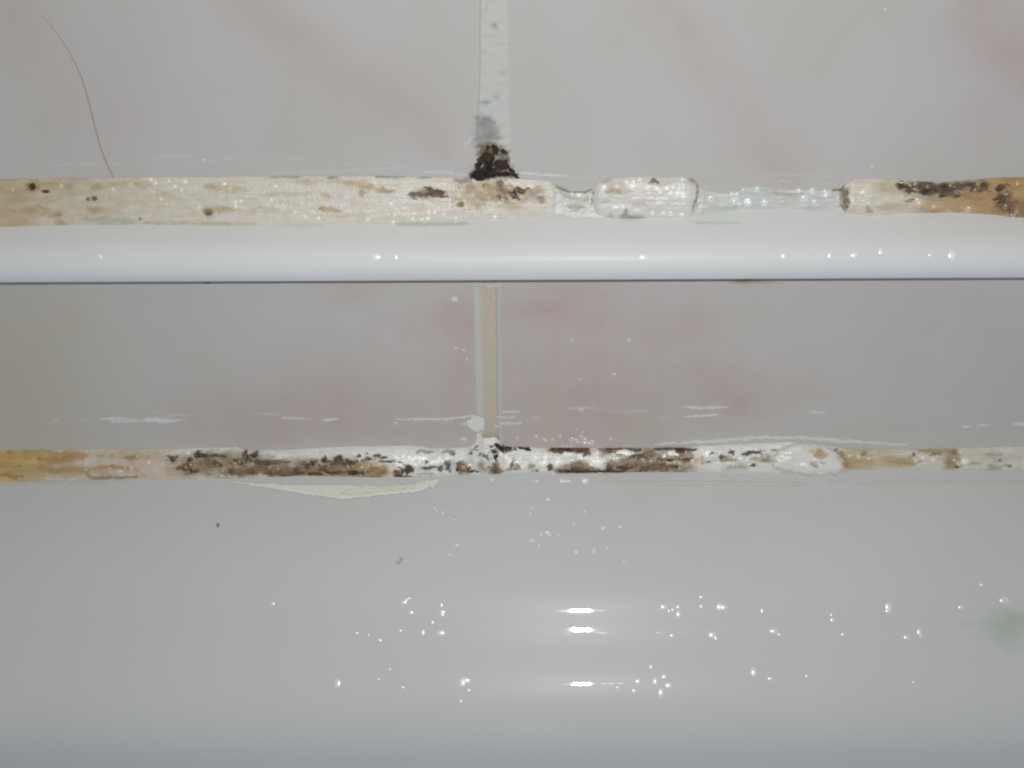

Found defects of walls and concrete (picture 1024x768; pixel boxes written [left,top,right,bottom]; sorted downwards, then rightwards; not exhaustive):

water stain [408,118,544,207]
water stain [0,180,49,227]
water stain [896,180,1009,203]
water stain [167,443,775,477]